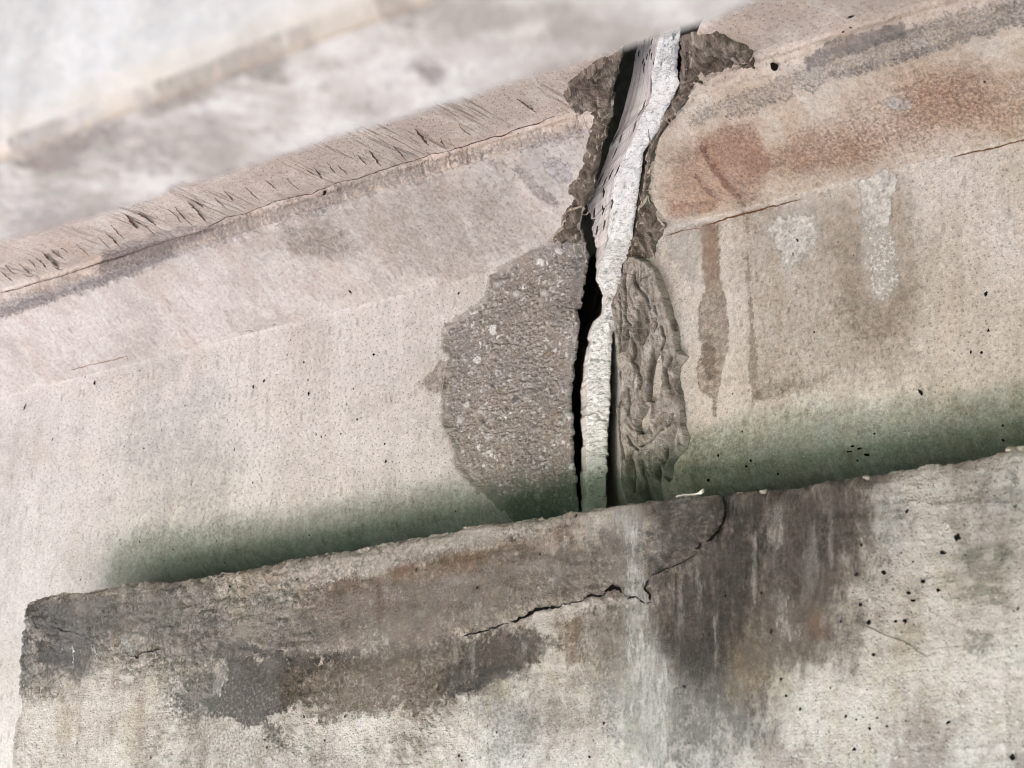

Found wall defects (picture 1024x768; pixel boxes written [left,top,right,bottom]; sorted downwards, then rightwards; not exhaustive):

crack [1,116,554,293]
corrosion [695,125,770,202]
corrosion [784,75,1021,166]
spalling [439,233,590,522]
spalling [611,256,691,504]
water stain [667,222,729,416]
water stain [20,475,878,768]
crack [462,496,727,639]